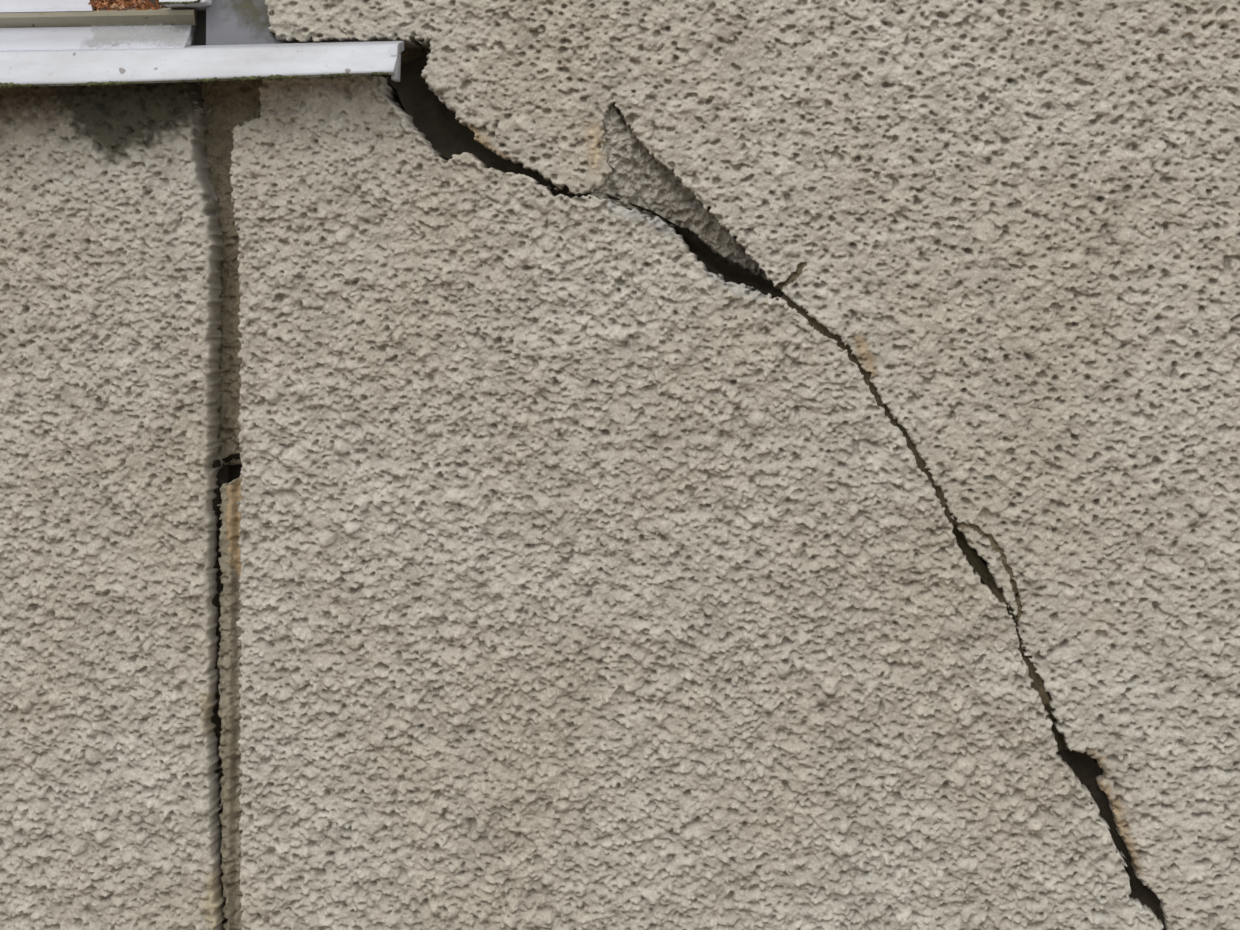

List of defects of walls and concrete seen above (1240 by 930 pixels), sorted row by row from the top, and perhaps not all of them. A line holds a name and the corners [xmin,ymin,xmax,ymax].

crack [211,453,243,929]
crack [383,49,1167,930]